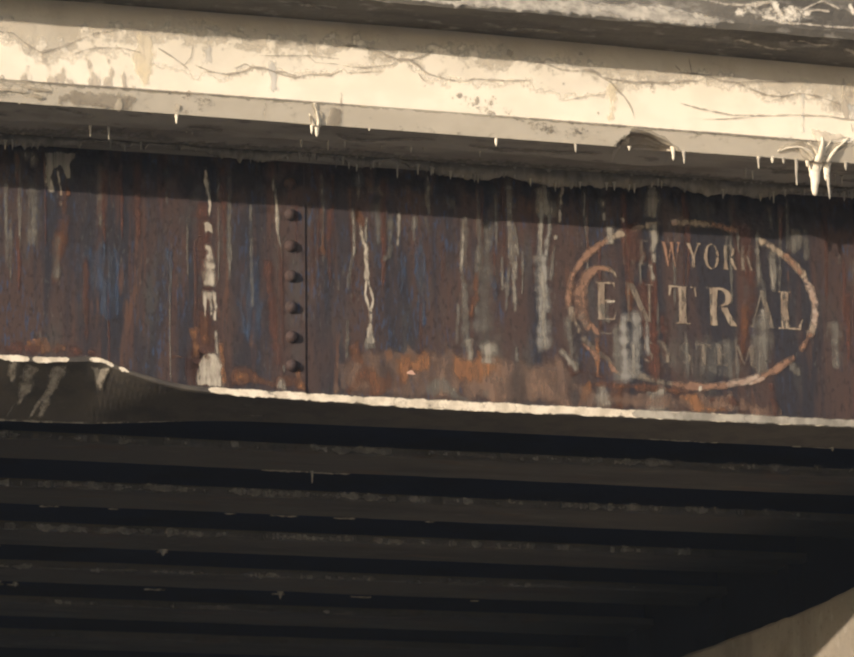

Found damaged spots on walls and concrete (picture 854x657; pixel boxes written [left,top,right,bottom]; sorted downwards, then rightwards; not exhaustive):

crack [0,22,137,54]
crack [28,47,356,106]
crack [347,45,528,81]
crack [500,61,853,151]
leakage [0,20,854,380]
corrosion [191,202,306,391]
corrosion [5,339,94,354]
leakage [197,331,854,427]
corrosion [335,282,781,416]